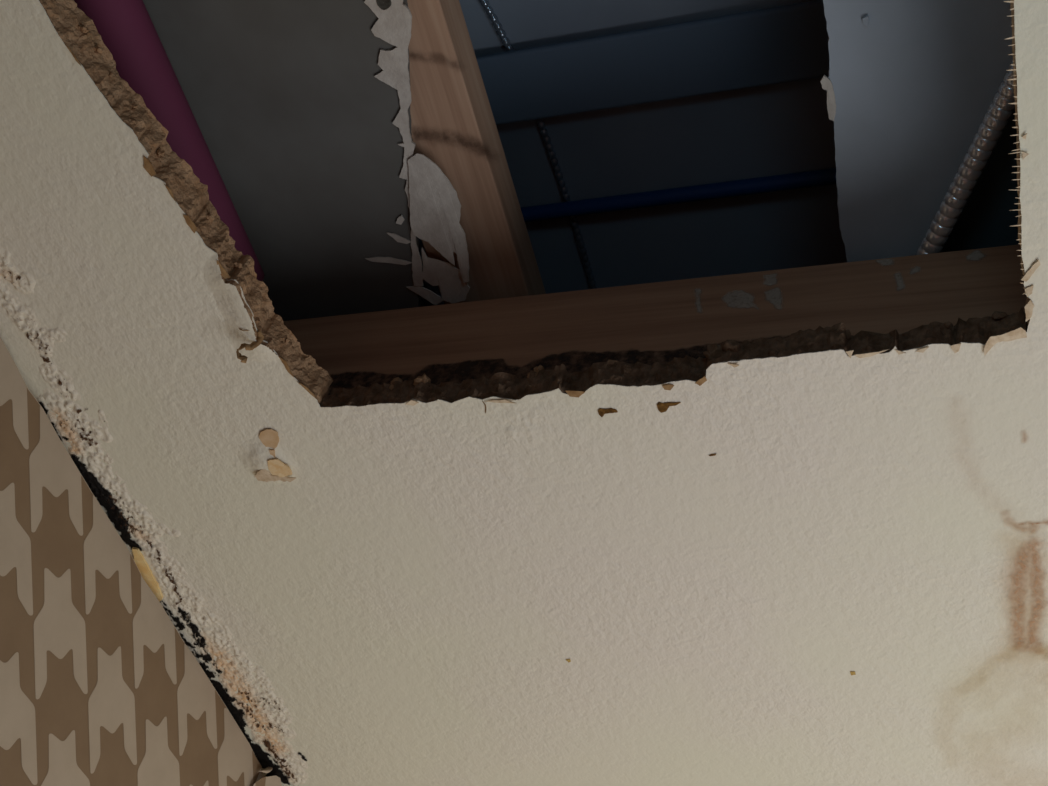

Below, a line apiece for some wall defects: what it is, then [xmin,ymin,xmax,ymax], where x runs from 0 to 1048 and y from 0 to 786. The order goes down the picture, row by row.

spalling [39,0,1032,413]